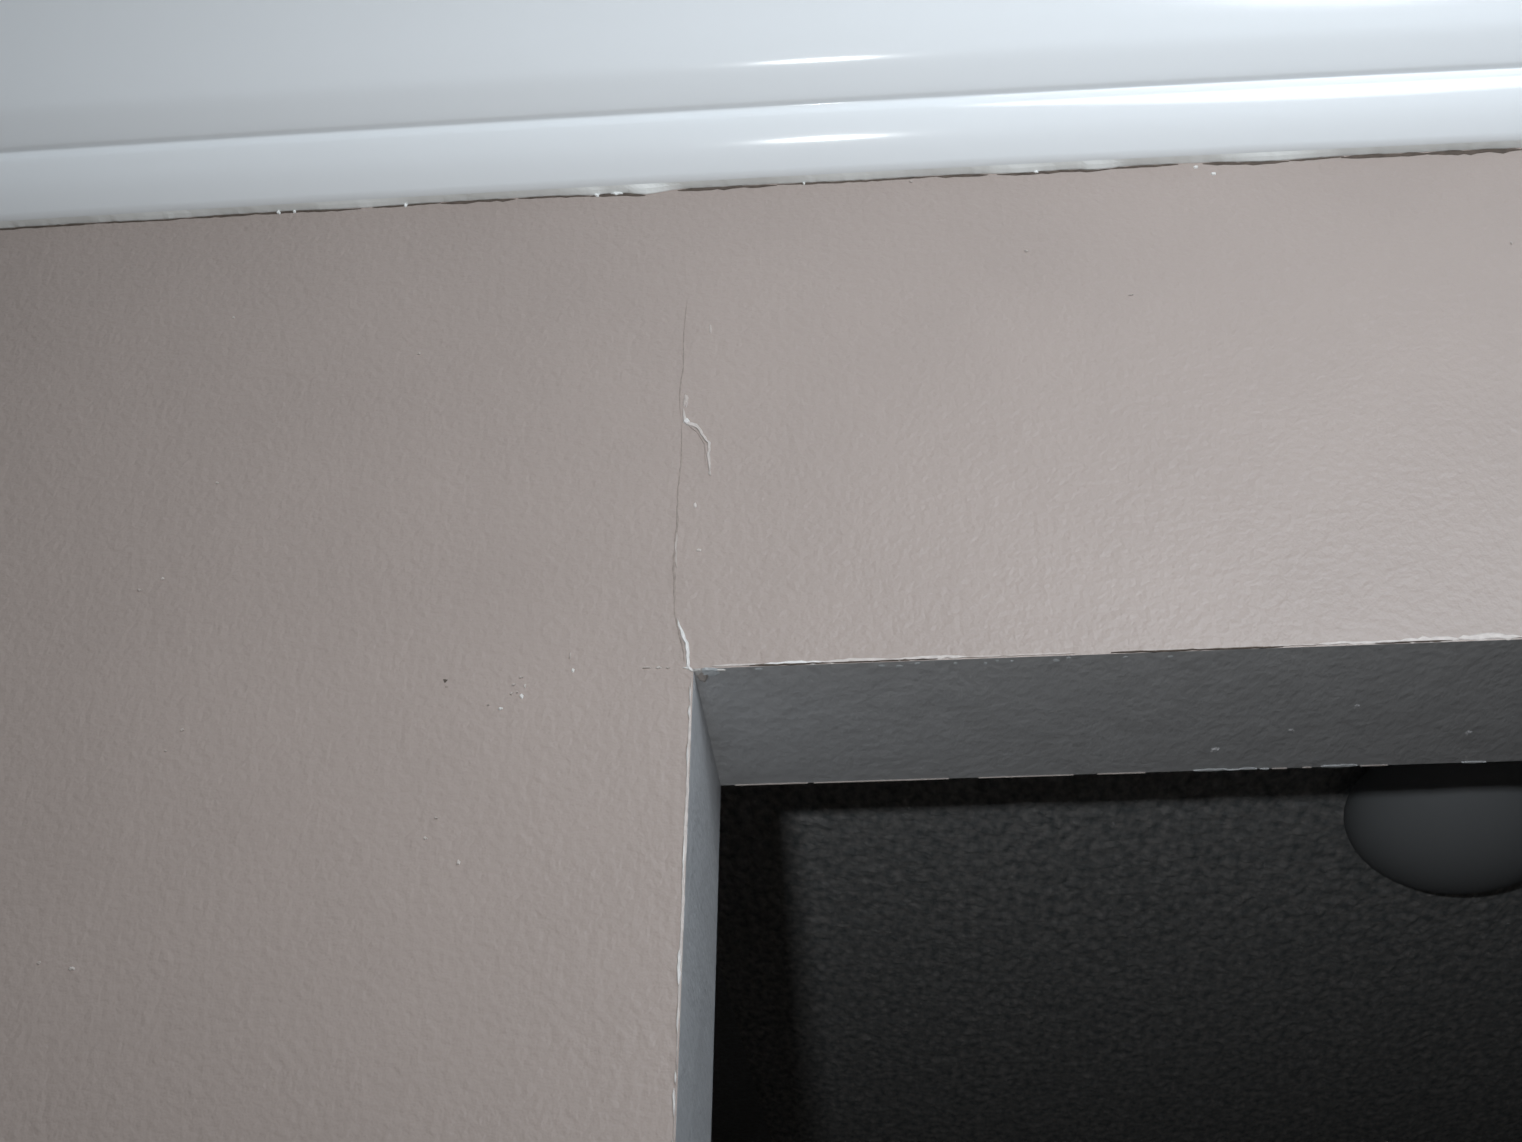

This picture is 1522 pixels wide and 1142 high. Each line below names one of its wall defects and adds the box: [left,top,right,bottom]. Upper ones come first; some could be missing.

crack [672,304,712,667]